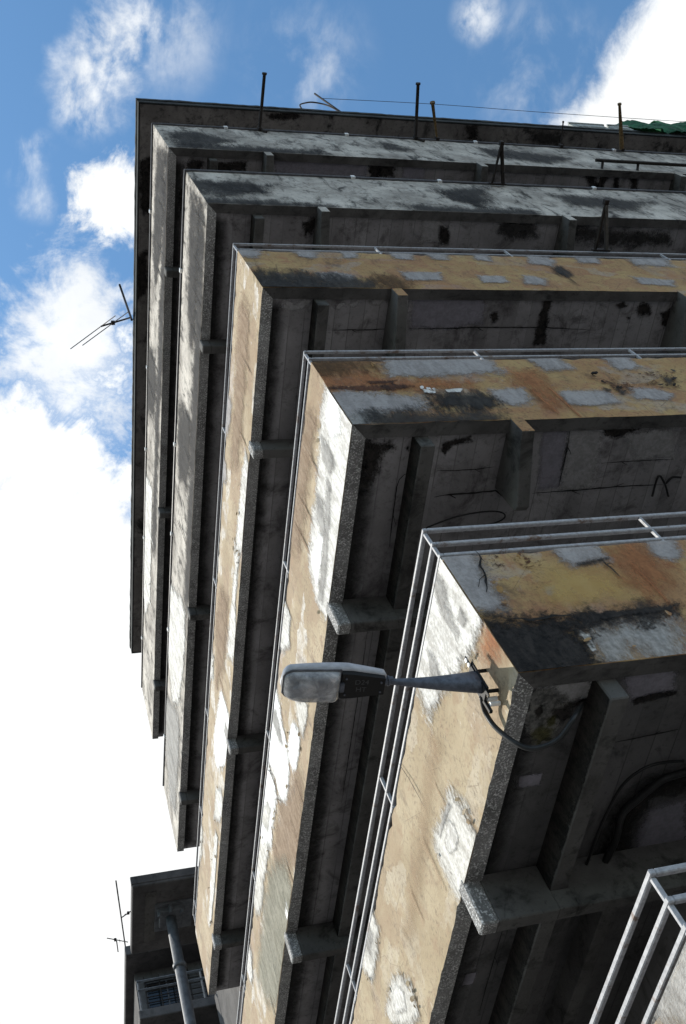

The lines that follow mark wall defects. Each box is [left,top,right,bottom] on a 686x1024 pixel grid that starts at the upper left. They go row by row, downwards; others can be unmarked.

leakage [398,187,546,245]
rust [553,266,576,283]
leakage [532,301,552,346]
rust [312,361,474,392]
crack [537,432,673,494]
crack [476,551,488,592]
leakage [480,599,683,672]
peeling [254,690,308,917]
peeling [433,786,476,904]
peeling [385,968,421,1024]